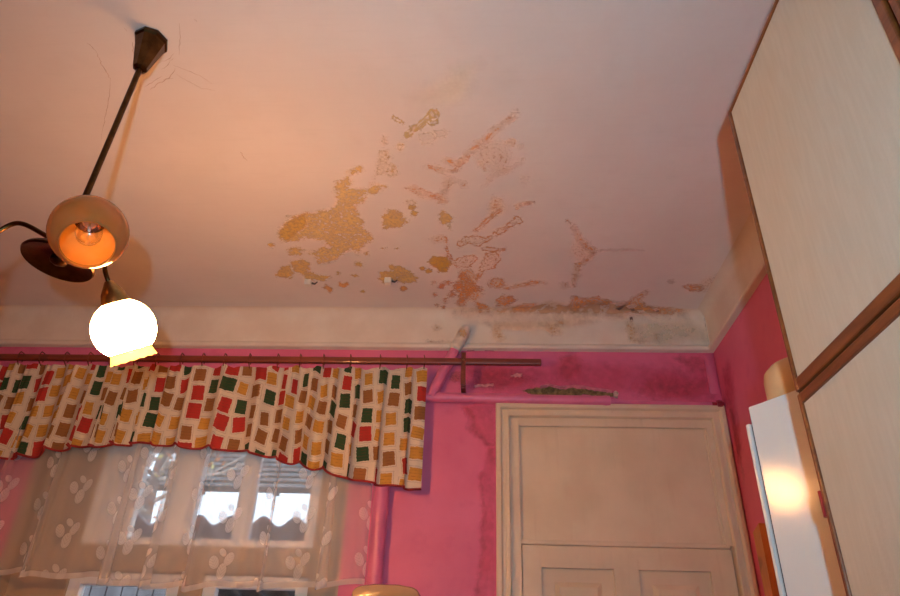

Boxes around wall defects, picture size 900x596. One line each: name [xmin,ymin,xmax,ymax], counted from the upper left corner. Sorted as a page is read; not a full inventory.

flaking render [521,384,619,398]